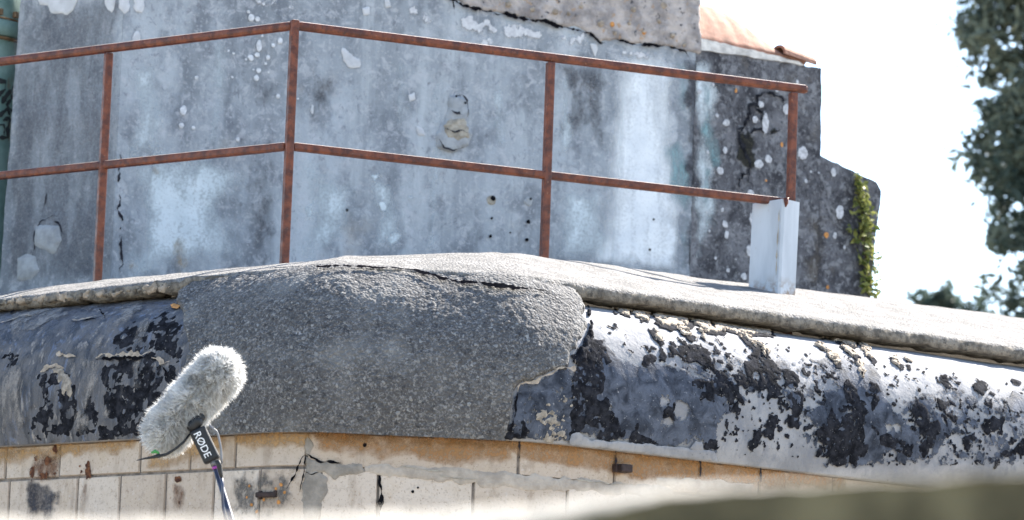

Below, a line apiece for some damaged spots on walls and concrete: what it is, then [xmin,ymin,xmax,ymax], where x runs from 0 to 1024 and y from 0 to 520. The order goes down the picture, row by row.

crack [116,154,124,272]
crack [316,264,547,291]
peeling [1,352,19,368]
peeling [28,308,184,441]
peeling [504,305,1024,470]
corrosion [0,440,134,481]
crack [286,453,339,489]